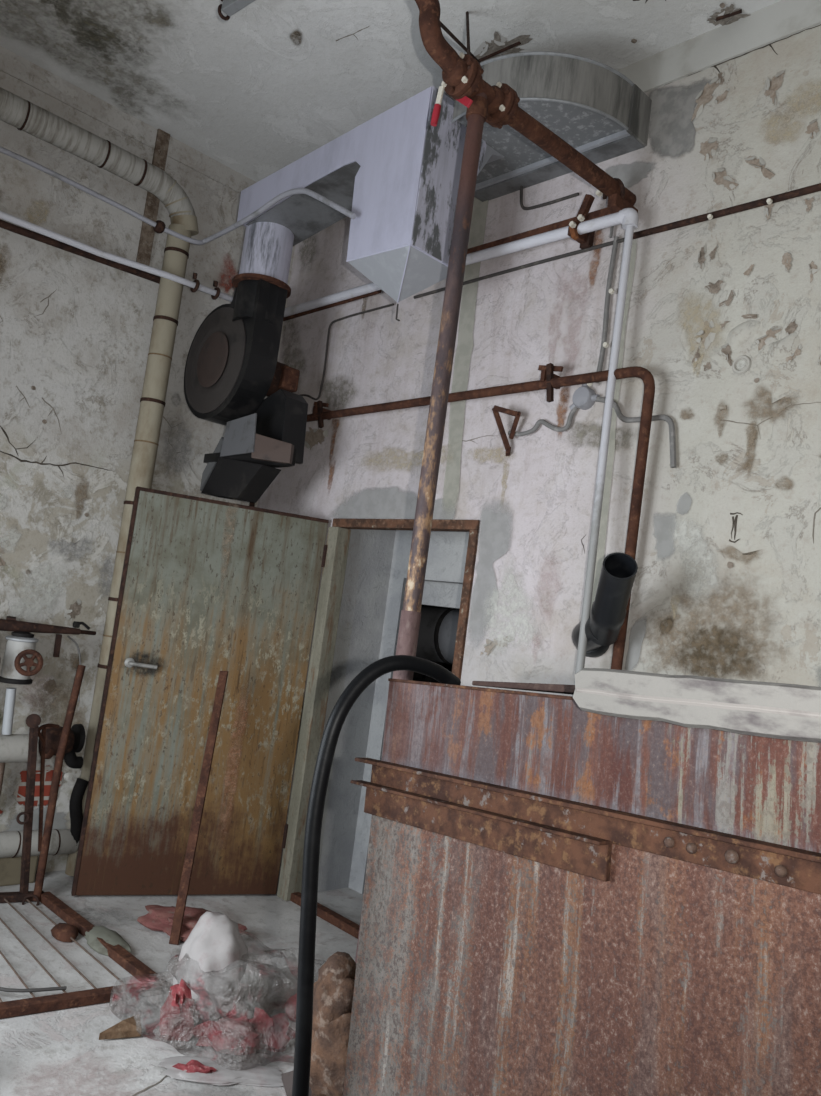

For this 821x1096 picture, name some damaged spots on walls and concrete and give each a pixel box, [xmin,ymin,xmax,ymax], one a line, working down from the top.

spalling [707,3,750,26]
damp [0,0,169,94]
crack [16,386,61,431]
crack [0,426,109,477]
damp [655,521,768,678]